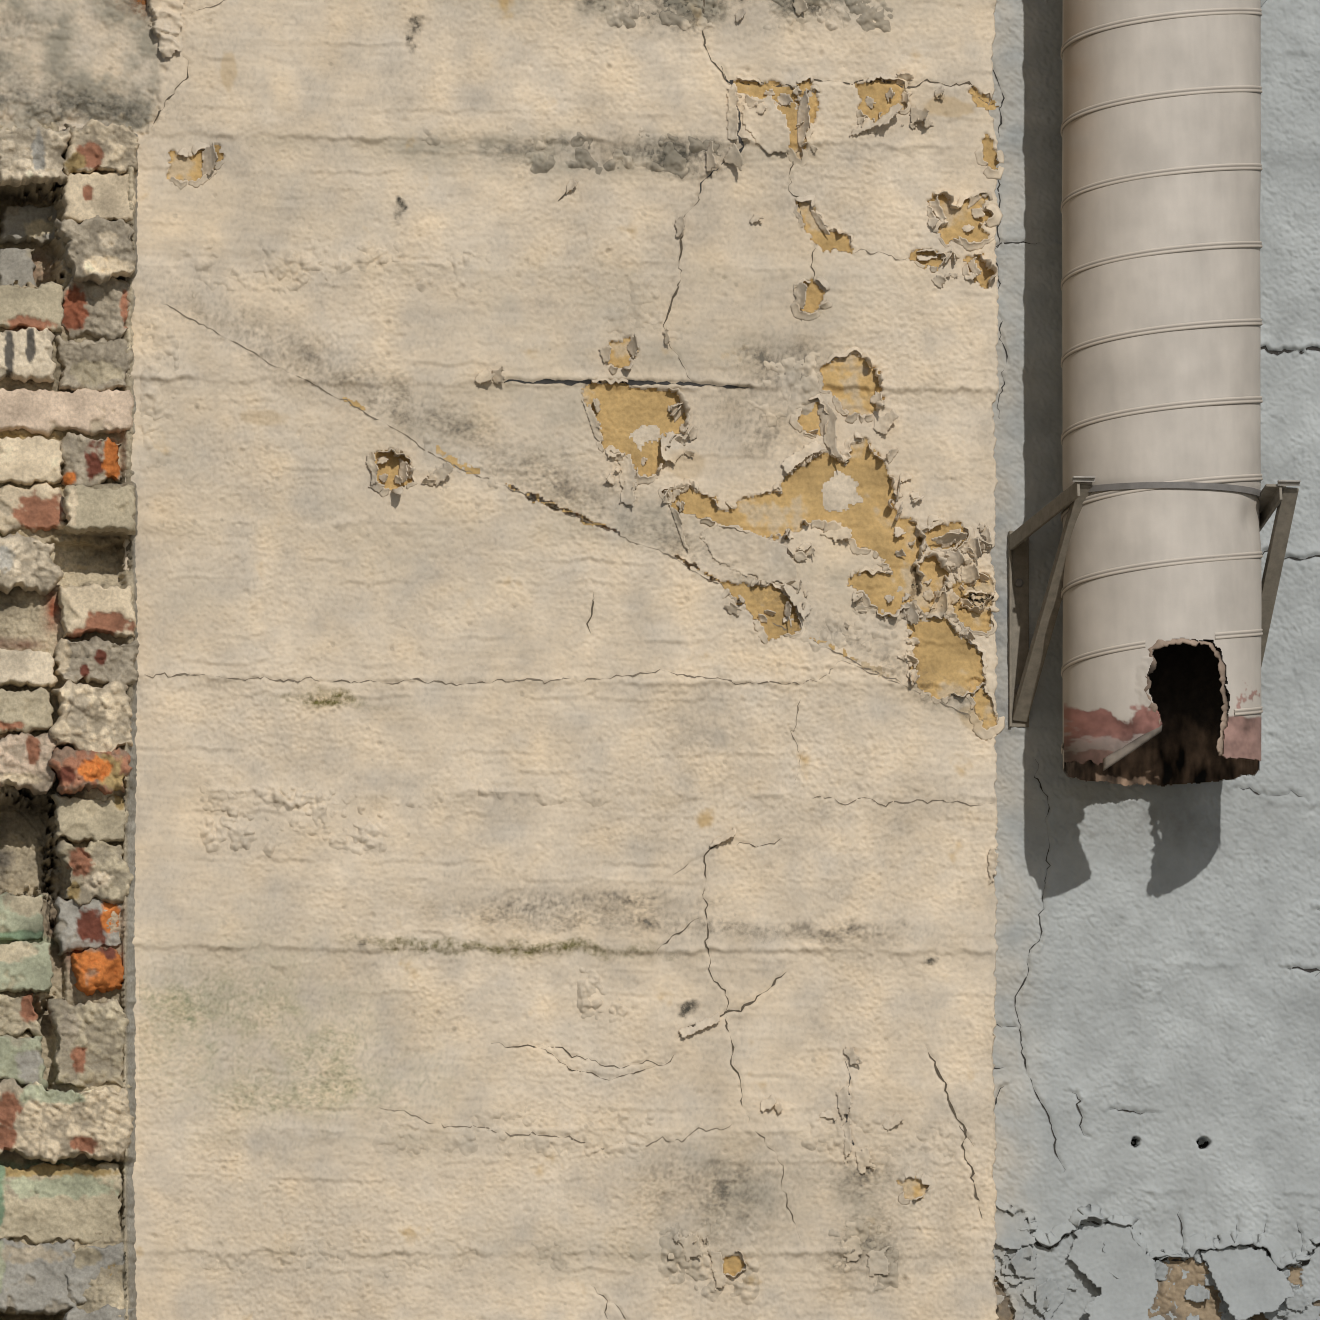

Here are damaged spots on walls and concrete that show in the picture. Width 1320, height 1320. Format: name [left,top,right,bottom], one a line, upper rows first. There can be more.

peeling [849,71,945,136]
crack [504,0,1005,389]
peeling [793,195,854,254]
peeling [909,134,1005,289]
crack [995,169,1037,288]
crack [997,321,1008,419]
crack [1261,345,1320,355]
peeling [366,446,454,497]
crack [146,304,992,807]
peeling [581,333,1005,741]
crack [379,838,799,1235]
peeling [993,1200,1320,1320]